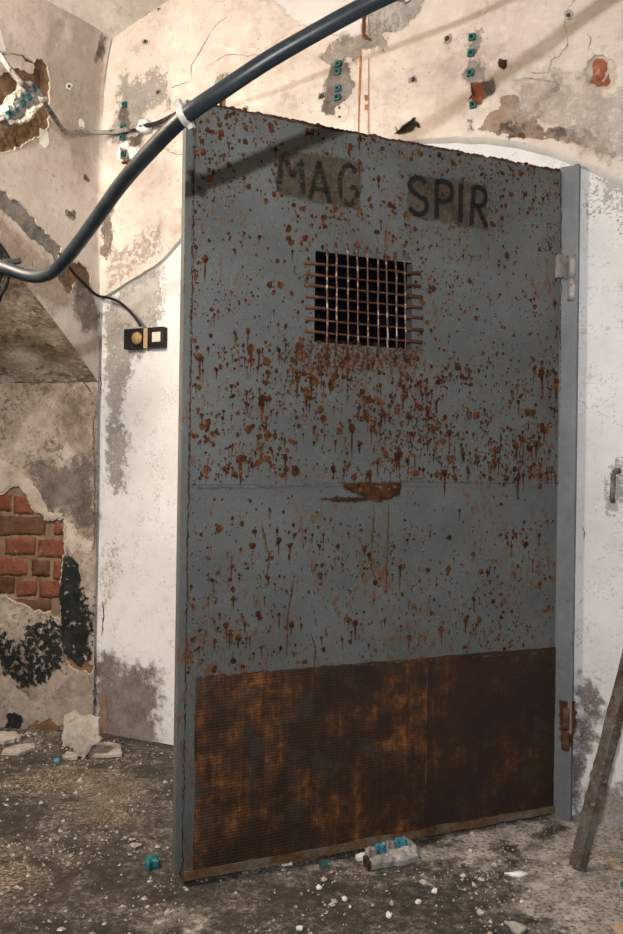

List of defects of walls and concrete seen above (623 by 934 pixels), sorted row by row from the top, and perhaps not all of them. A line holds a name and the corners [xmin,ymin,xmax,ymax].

crack [172,17,257,88]
flaking render [366,0,425,39]
flaking render [0,52,52,154]
damp [516,74,623,155]
flaking render [0,187,62,262]
flaking render [57,261,92,297]
rust [181,52,562,871]
flaking render [0,459,118,756]
rust [559,700,577,746]
damp [572,671,605,819]
damp [599,783,623,828]